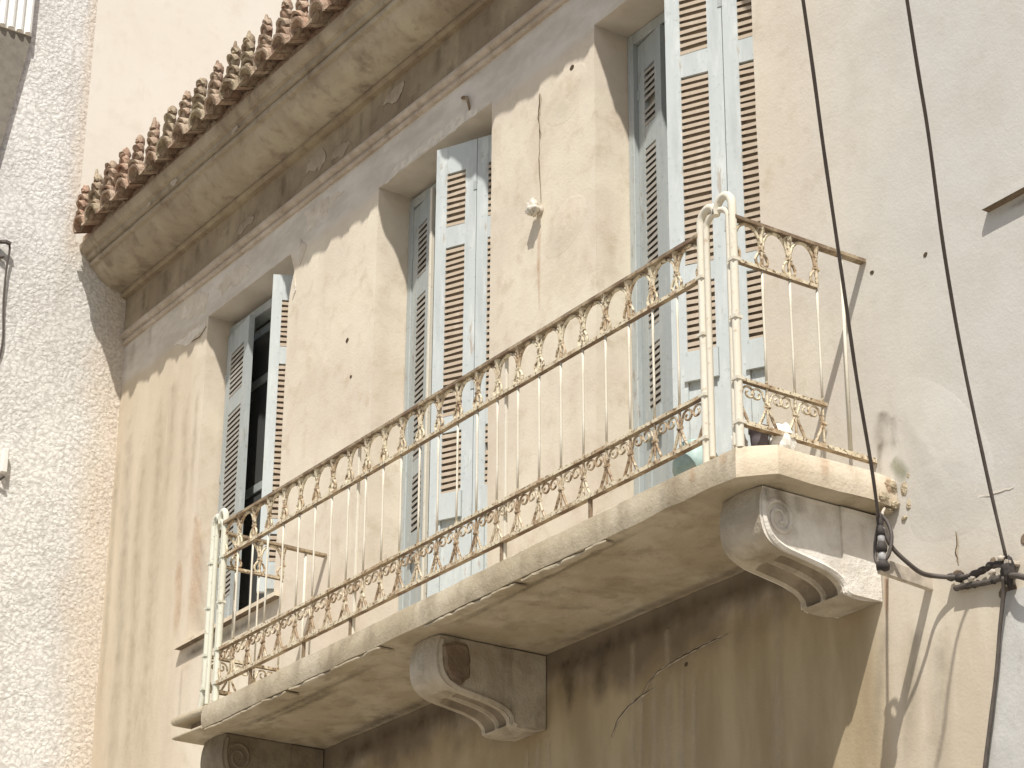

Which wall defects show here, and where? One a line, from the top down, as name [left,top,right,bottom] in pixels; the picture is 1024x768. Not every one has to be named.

spalling [879,472,911,521]
crack [611,633,729,737]